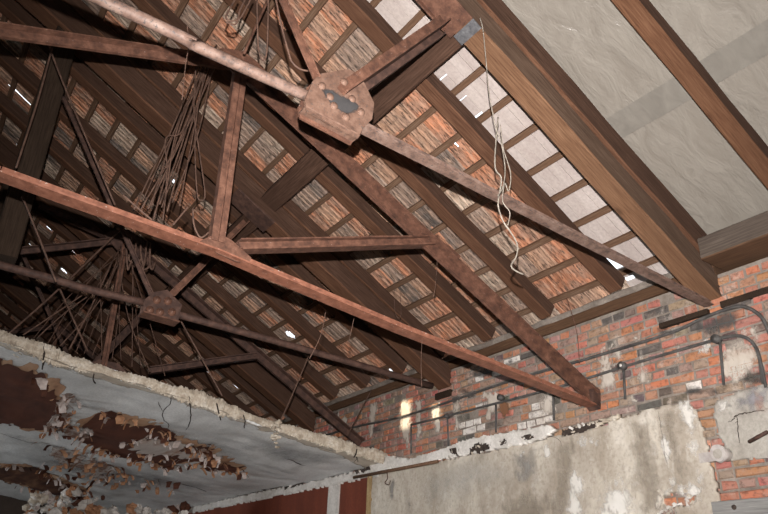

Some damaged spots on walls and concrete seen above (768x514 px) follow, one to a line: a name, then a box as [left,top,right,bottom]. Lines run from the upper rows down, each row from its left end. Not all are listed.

peeling [0,330,388,514]
spalling [562,420,602,436]
crack [730,410,764,443]
spalling [469,439,506,455]